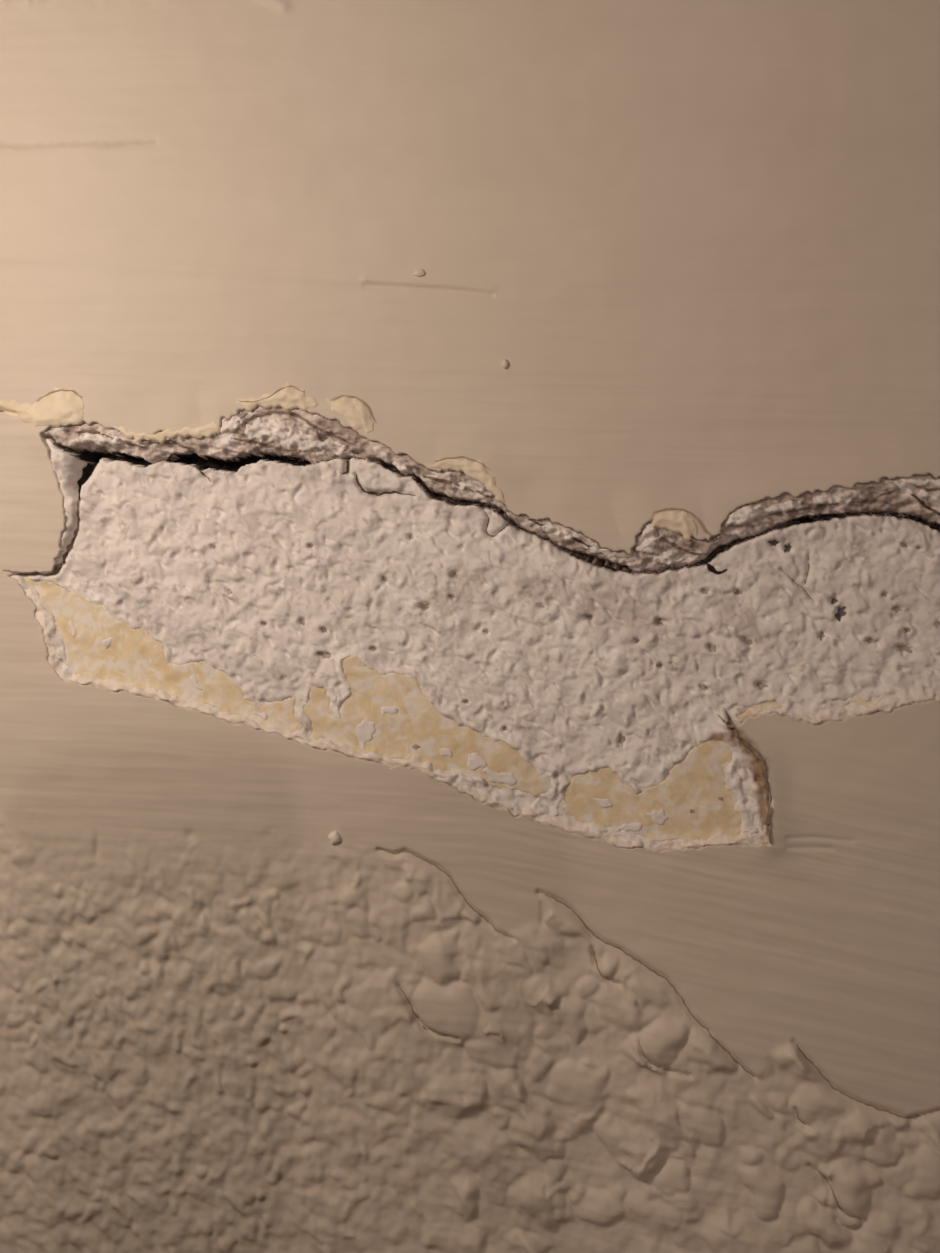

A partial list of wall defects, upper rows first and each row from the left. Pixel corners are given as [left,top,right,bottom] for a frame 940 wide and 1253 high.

crack [2,410,940,576]
flaking render [0,382,940,851]
crack [781,553,815,603]